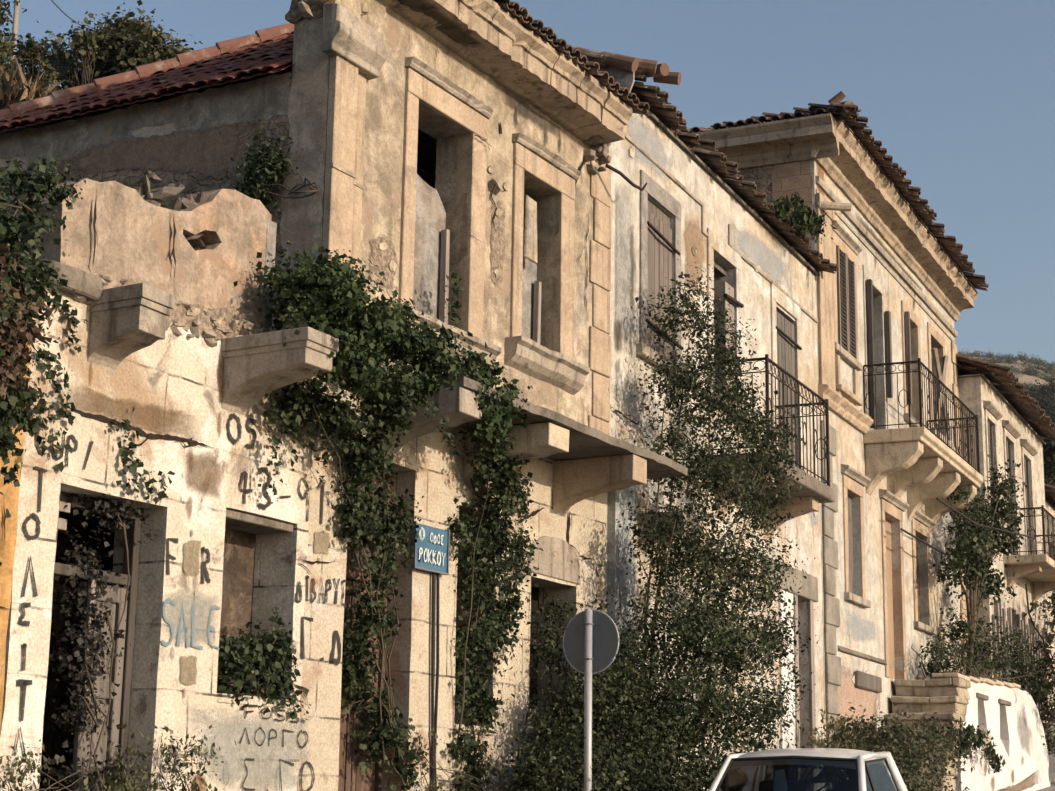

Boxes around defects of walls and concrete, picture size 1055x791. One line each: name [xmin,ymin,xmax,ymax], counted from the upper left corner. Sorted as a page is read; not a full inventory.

peeling [129,121,178,138]
crack [91,189,99,264]
crack [169,218,177,278]
peeling [487,165,511,287]
spalling [166,300,260,341]
crack [70,409,211,448]